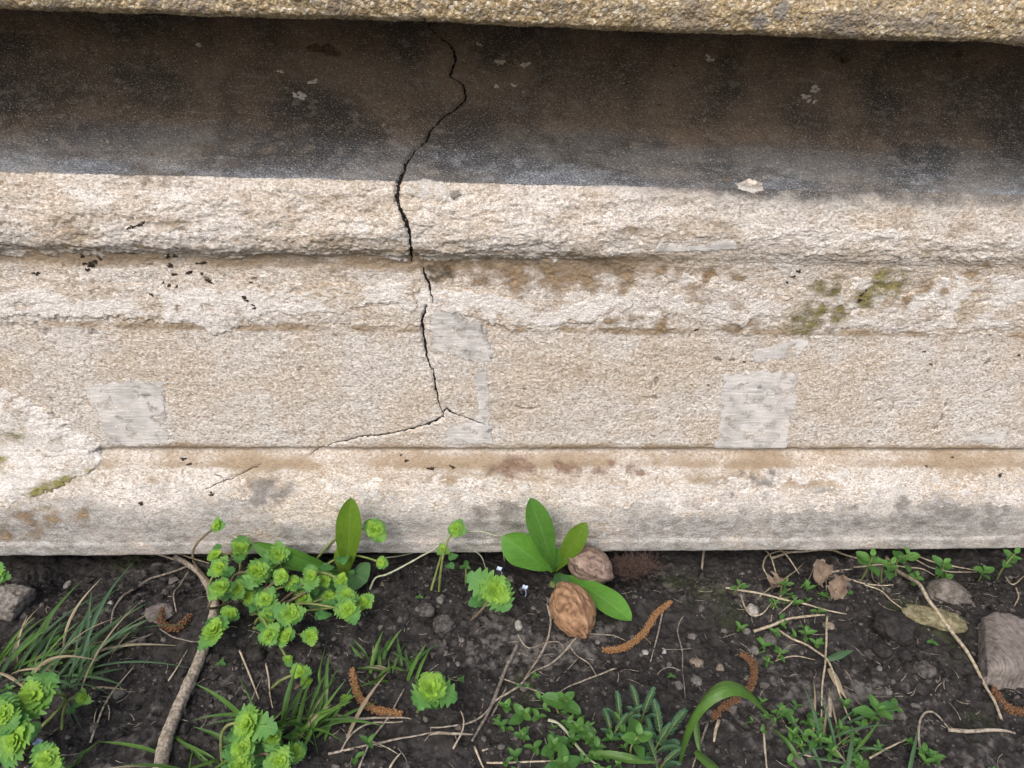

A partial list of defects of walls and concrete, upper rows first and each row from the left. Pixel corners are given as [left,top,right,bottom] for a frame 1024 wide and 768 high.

crack [311,18,485,454]